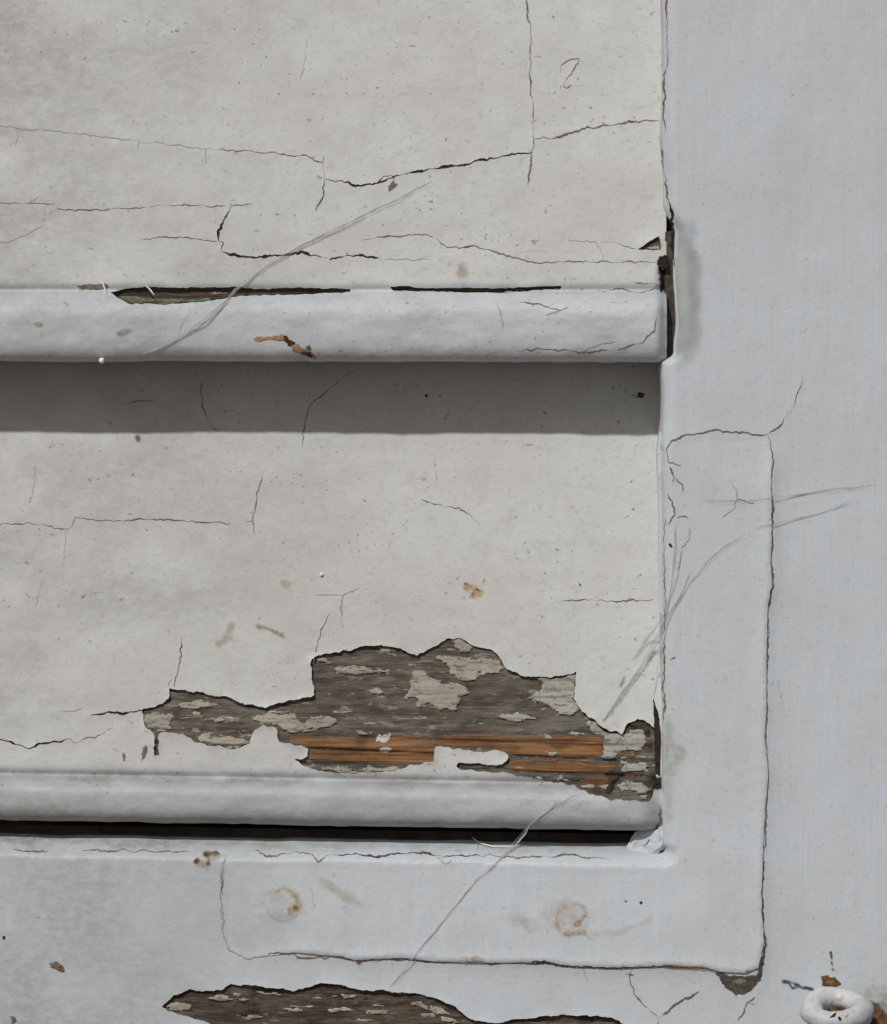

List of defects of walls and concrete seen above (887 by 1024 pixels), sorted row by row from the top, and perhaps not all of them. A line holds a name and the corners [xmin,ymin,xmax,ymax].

crack [0,0,675,293]
peeling [253,334,316,360]
crack [2,467,265,561]
peeling [141,638,655,802]
crack [560,380,803,970]
crack [83,846,183,854]
peeling [162,983,622,1024]
crack [219,850,718,1023]